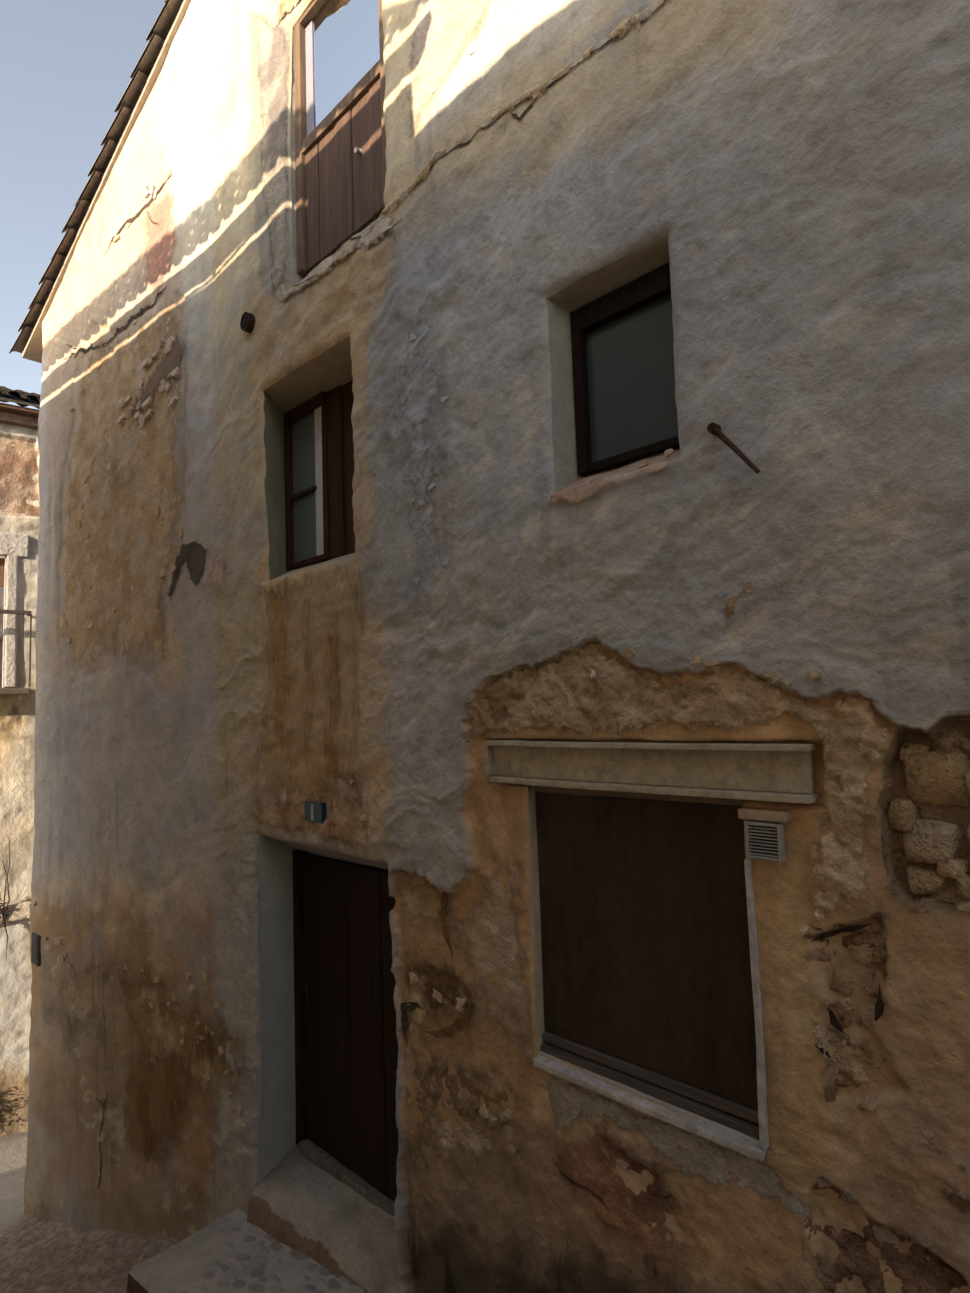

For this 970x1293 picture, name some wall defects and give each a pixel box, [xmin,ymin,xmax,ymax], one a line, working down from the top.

crack [378,0,666,219]
peeling [142,185,175,289]
crack [65,283,168,375]
flaking render [61,308,183,663]
flaking render [459,642,970,1111]
spalling [401,880,489,1050]
leakage [124,1035,216,1167]
spalling [415,1057,516,1163]
leakage [408,1227,688,1293]
flaking render [555,1130,683,1272]
spalling [801,1174,969,1293]